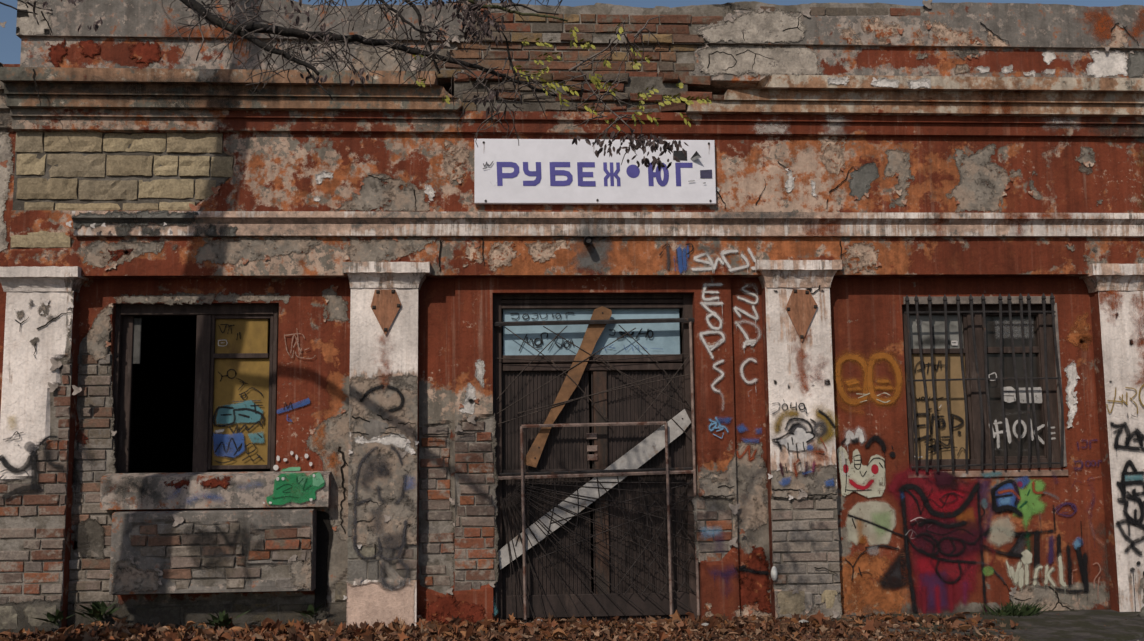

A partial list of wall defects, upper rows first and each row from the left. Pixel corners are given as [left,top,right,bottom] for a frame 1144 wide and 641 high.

crack [707,32,771,72]
peeling [424,0,1056,113]
peeling [1086,23,1144,78]
flaking render [0,85,323,271]
flaking render [335,173,436,212]
peeling [756,124,785,133]
flaking render [818,114,915,208]
flaking render [945,143,1042,212]
peeling [321,284,350,323]
peeling [1064,362,1086,428]
flaking render [0,291,499,633]
flaking render [692,441,842,621]